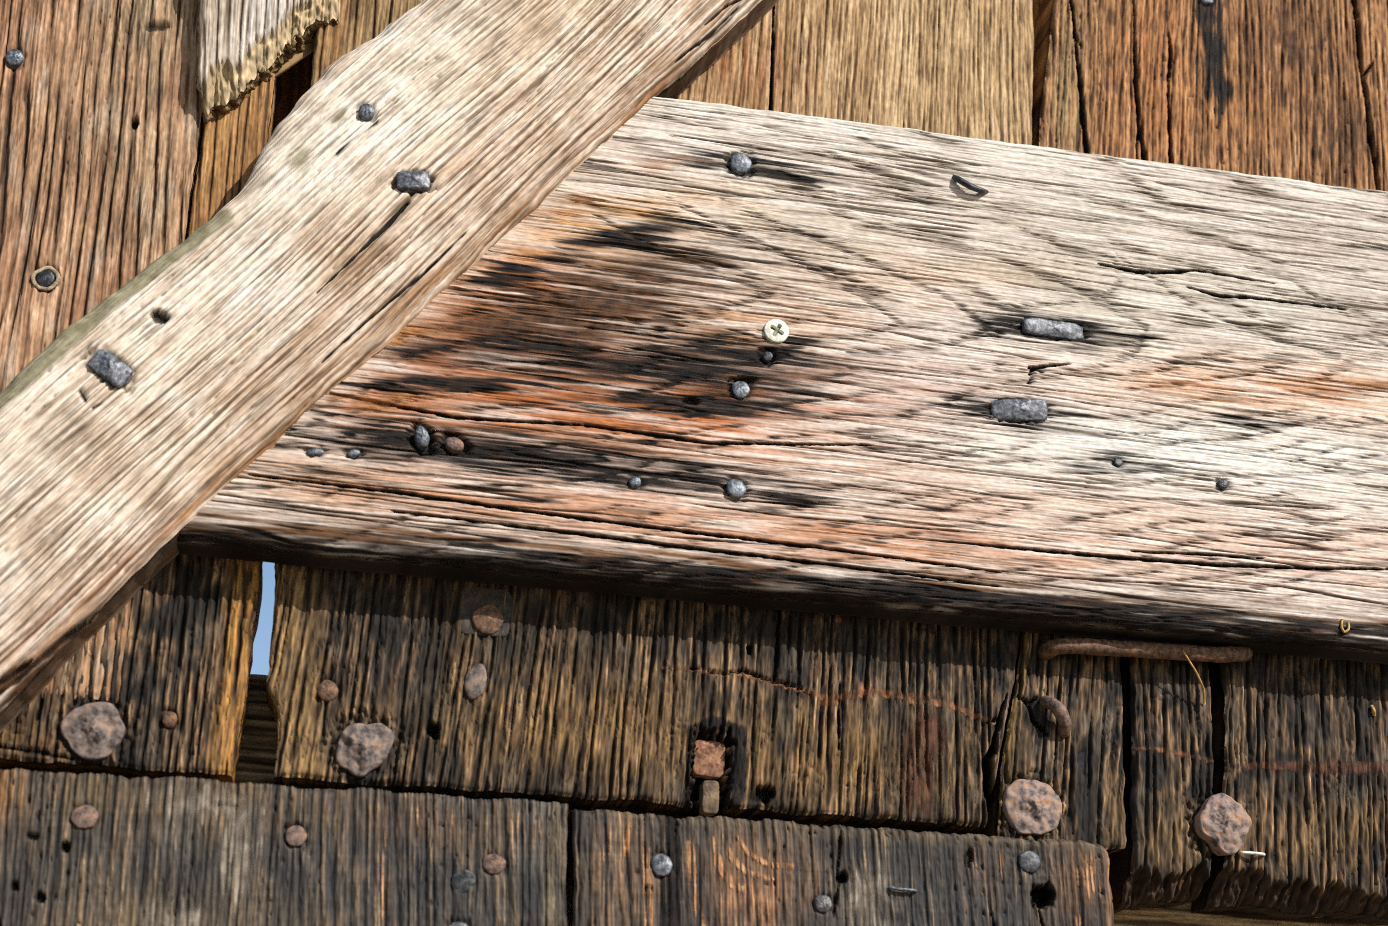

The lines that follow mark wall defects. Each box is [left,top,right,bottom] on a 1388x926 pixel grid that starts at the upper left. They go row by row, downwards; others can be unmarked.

crack [1069,0,1088,154]
water stain [1193,0,1233,126]
crack [1351,0,1376,190]
water stain [524,196,599,221]
crack [1097,264,1345,311]
water stain [286,217,860,511]
rust [662,667,996,822]
crack [834,683,842,750]
crack [981,696,1048,800]